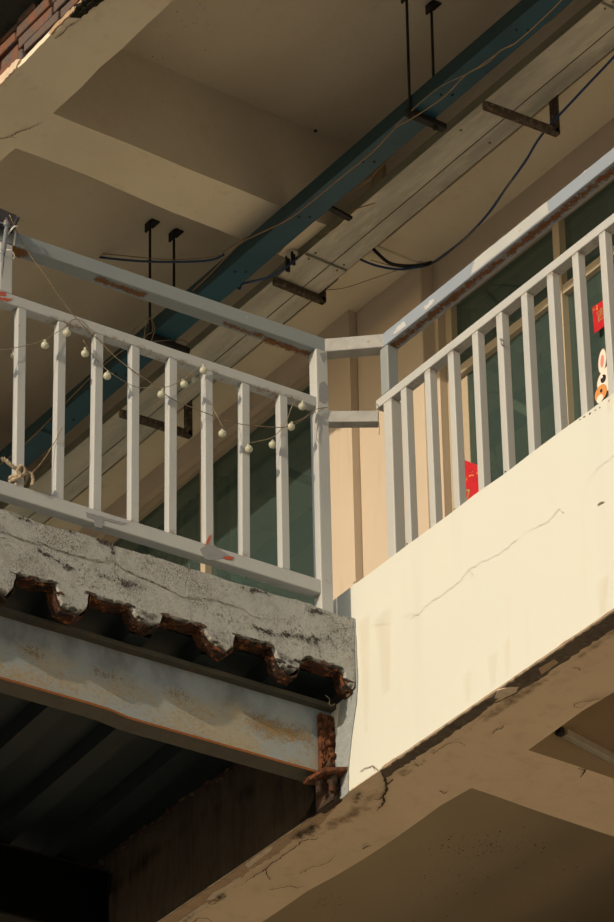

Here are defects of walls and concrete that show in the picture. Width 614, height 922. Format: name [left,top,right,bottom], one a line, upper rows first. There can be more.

corrosion [390,167,614,348]
spalling [11,572,64,596]
spalling [85,591,144,620]
crack [0,531,291,621]
corrosion [0,575,353,700]
flaking render [161,619,358,922]
crack [360,765,393,811]
crack [246,837,336,890]